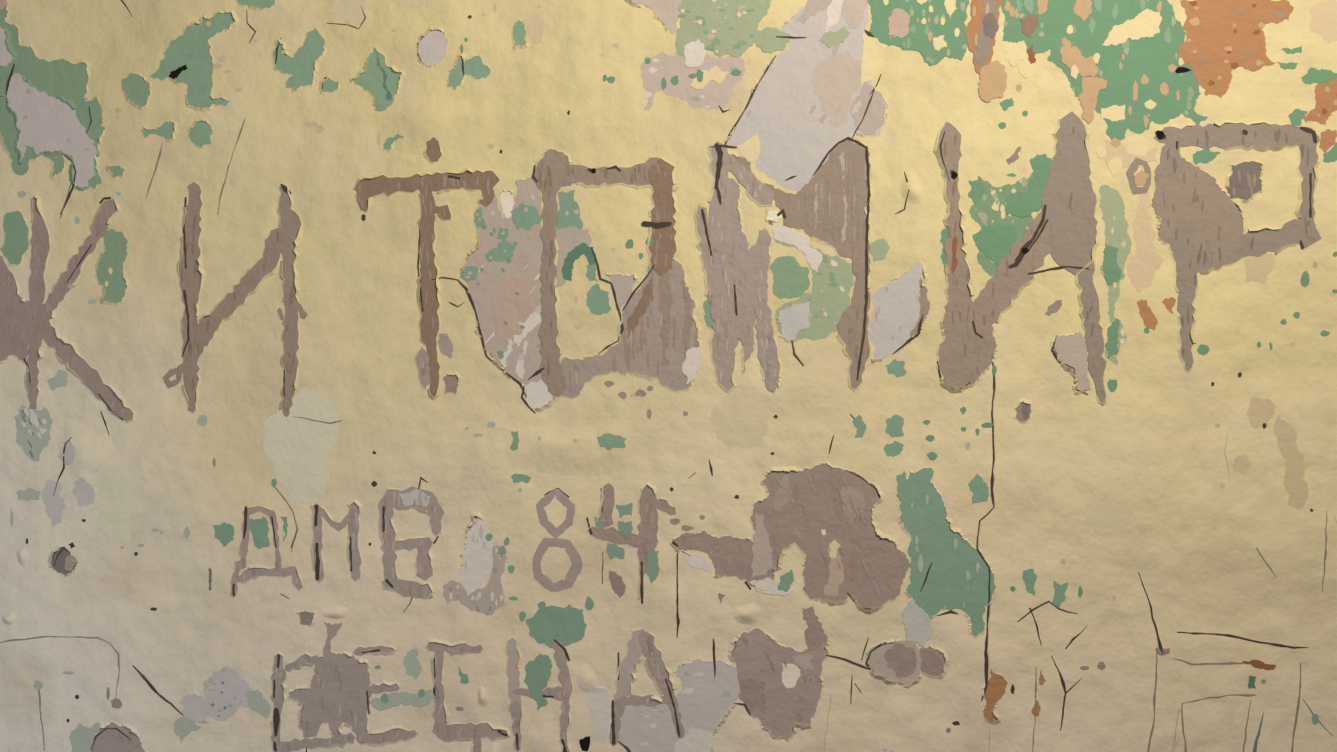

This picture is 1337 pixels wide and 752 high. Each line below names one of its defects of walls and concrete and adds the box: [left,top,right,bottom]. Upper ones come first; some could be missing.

peeling [511,19,530,51]
peeling [624,0,969,389]
peeling [933,0,1337,373]
spalling [352,137,738,412]
crack [893,315,923,354]
crack [1051,336,1087,394]
peeling [1050,330,1091,395]
peeling [597,433,627,450]
peeling [884,415,904,457]
crack [920,356,1088,731]
spalling [174,461,998,752]
spalling [69,720,146,752]